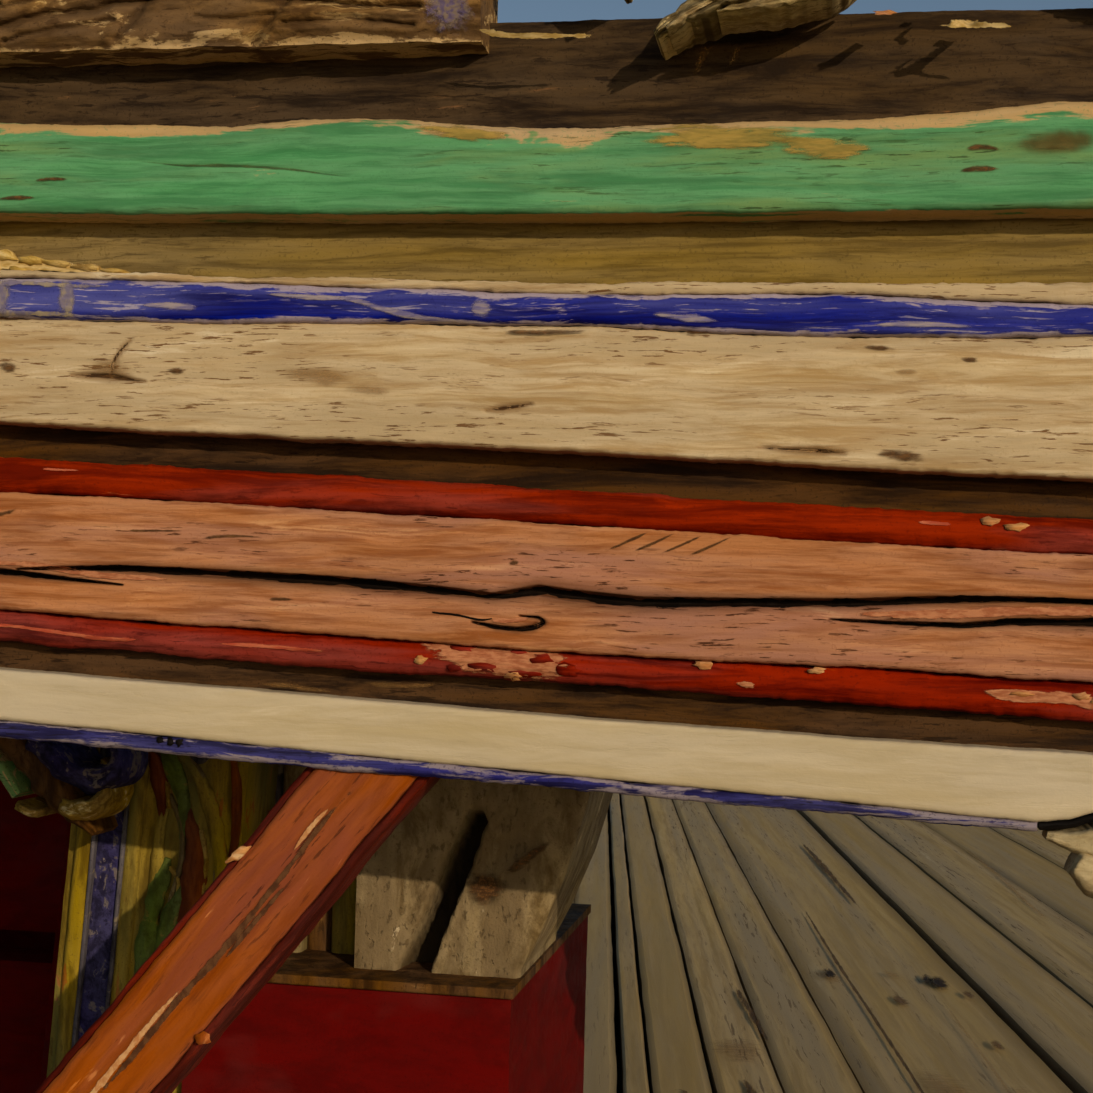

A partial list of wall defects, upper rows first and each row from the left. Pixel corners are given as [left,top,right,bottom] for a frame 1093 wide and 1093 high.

peeling [423,126,503,140]
peeling [653,125,867,159]
peeling [0,249,130,319]
peeling [144,302,194,310]
peeling [272,293,489,324]
crack [80,343,139,381]
crack [0,561,1093,631]
peeling [414,643,582,682]
peeling [986,689,1093,710]